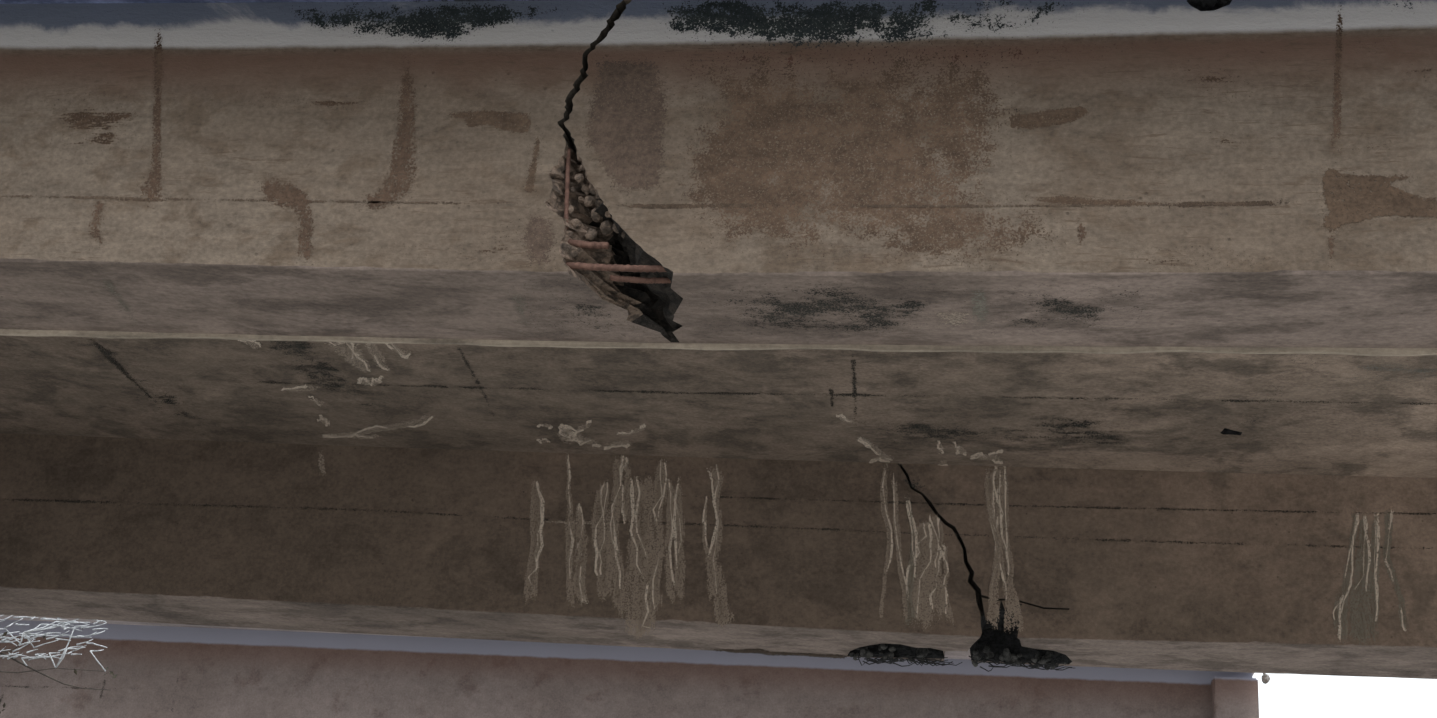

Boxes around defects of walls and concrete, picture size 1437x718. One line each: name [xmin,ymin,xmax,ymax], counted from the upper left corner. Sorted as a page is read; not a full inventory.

crack [557,0,626,157]
water stain [660,0,1071,53]
spalling [521,143,683,342]
crack [4,498,459,516]
water stain [281,385,433,475]
water stain [325,342,411,386]
water stain [523,419,734,641]
water stain [836,414,954,630]
spalling [848,601,1072,672]
crack [495,464,1436,630]
water stain [936,441,1024,633]
water stain [1333,510,1409,647]